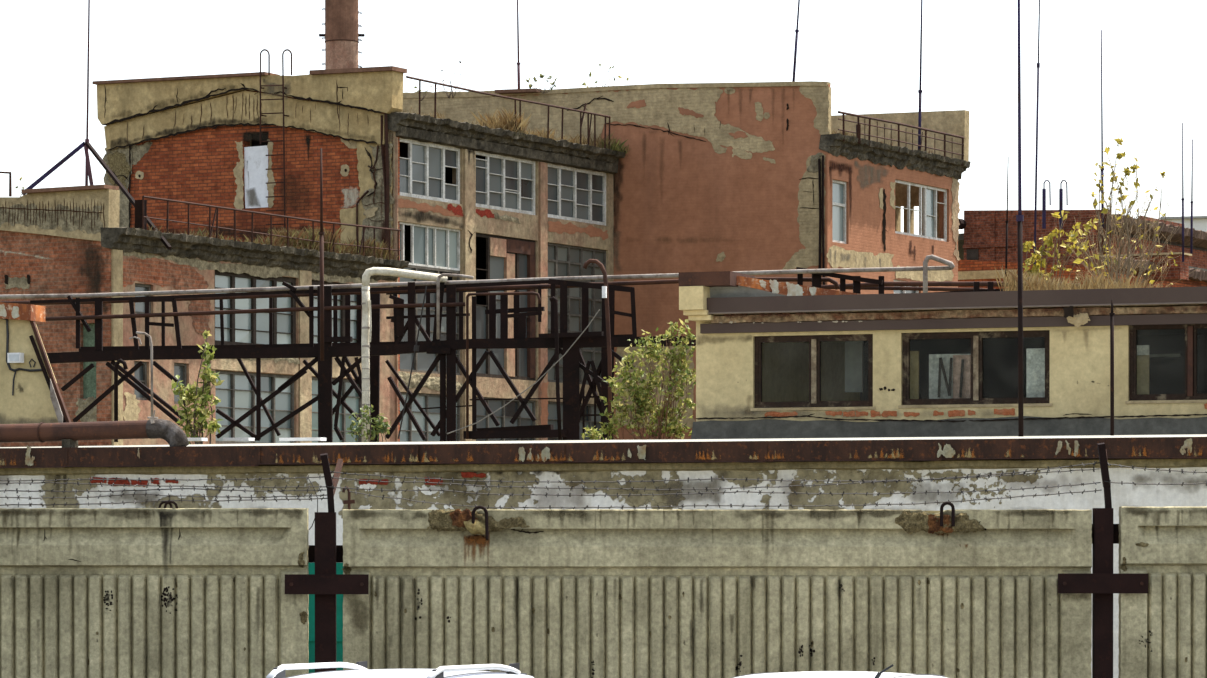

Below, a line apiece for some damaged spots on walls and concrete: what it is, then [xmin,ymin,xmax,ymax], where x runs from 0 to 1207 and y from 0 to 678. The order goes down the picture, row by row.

crack [0,82,384,231]
peeling [401,87,776,164]
peeling [799,84,830,135]
peeling [248,189,258,205]
spalling [361,143,521,245]
peeling [783,153,960,281]
peeling [41,473,320,509]
peeling [558,470,685,510]
peeling [713,469,1043,534]
corrosion [464,536,489,556]